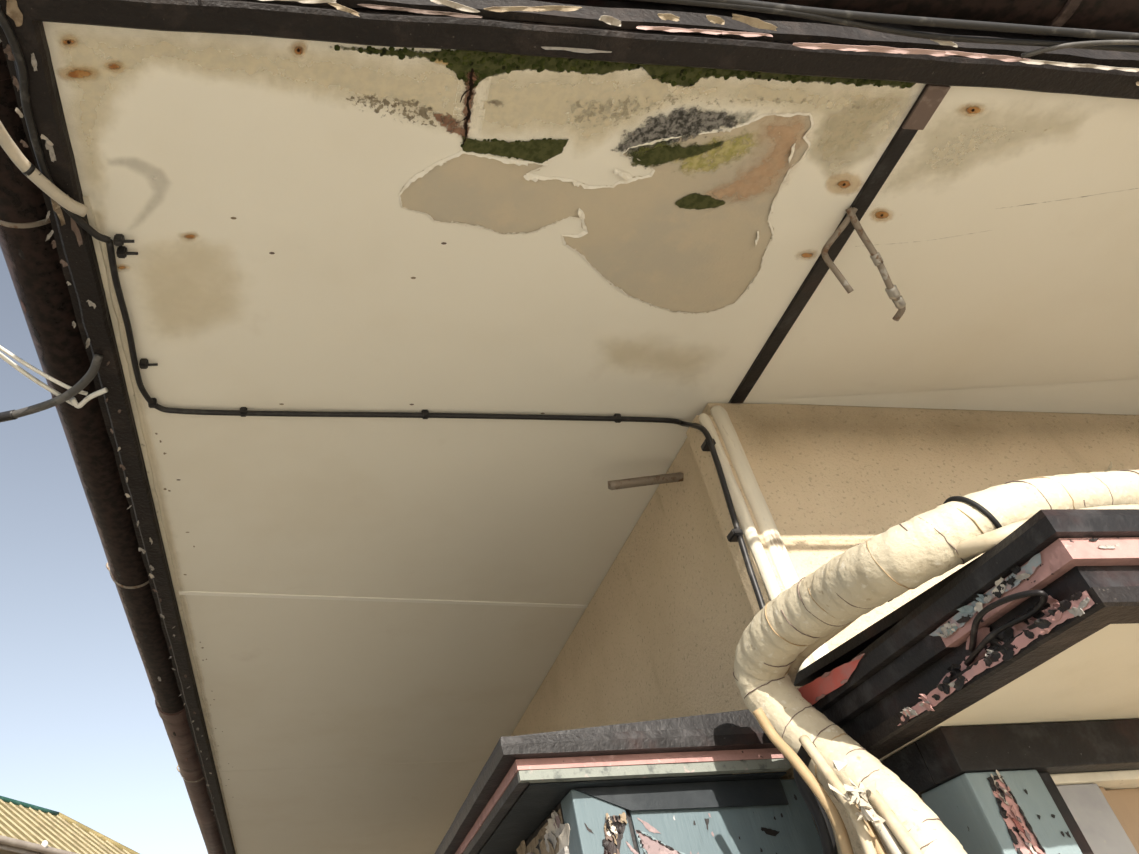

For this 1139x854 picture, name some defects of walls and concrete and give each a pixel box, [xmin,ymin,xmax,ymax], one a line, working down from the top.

peeling [260,0,582,18]
peeling [599,15,621,27]
peeling [636,13,778,37]
corrosion [68,70,91,78]
peeling [792,39,1139,86]
water stain [612,108,752,157]
peeling [398,112,814,314]
peeling [898,553,1095,726]
peeling [797,653,865,705]
peeling [516,809,570,854]
peeling [585,812,699,854]
peeling [987,770,1060,854]